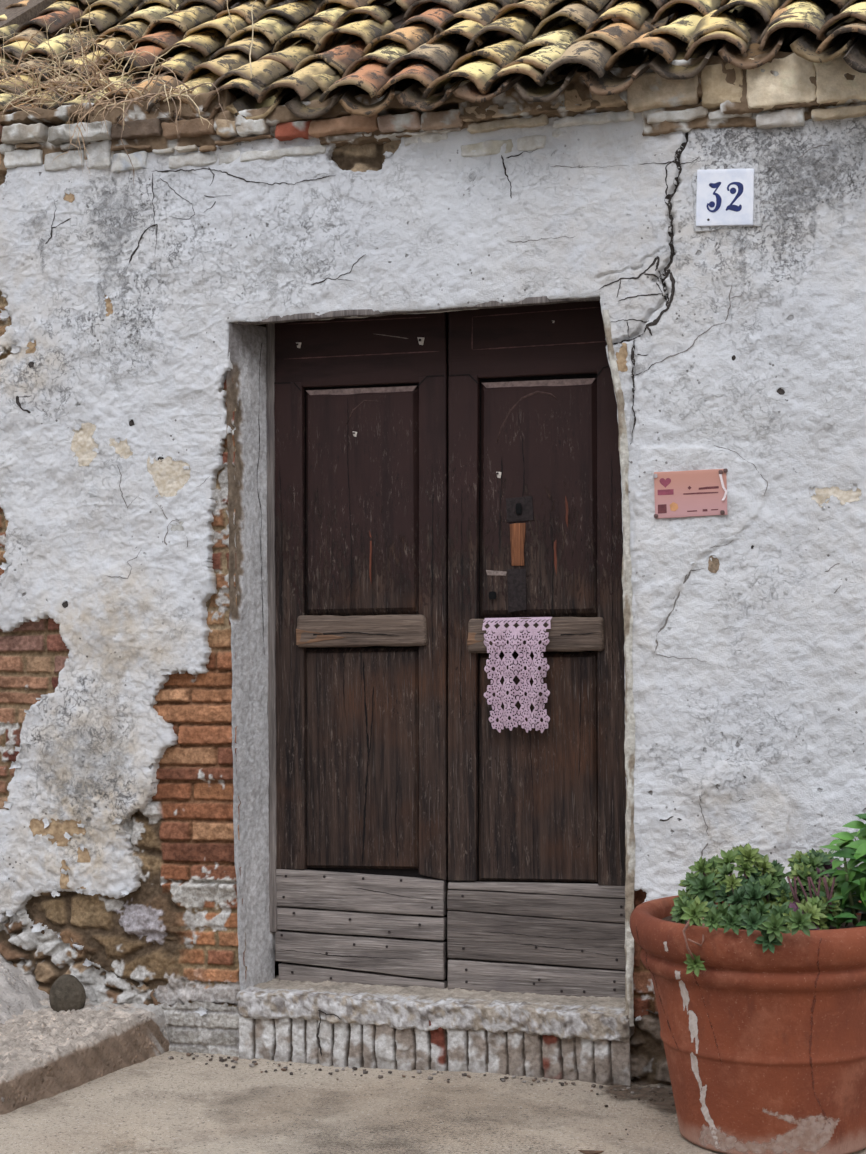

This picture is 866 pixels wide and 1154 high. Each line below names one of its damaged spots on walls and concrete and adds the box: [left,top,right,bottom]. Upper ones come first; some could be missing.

spalling [331,140,401,172]
crack [129,167,335,263]
flaking render [0,291,36,368]
crack [501,132,739,445]
peeling [809,484,862,509]
crack [655,540,733,662]
flaking render [0,375,247,1016]
flaking render [634,889,647,909]
spalling [630,940,671,1086]